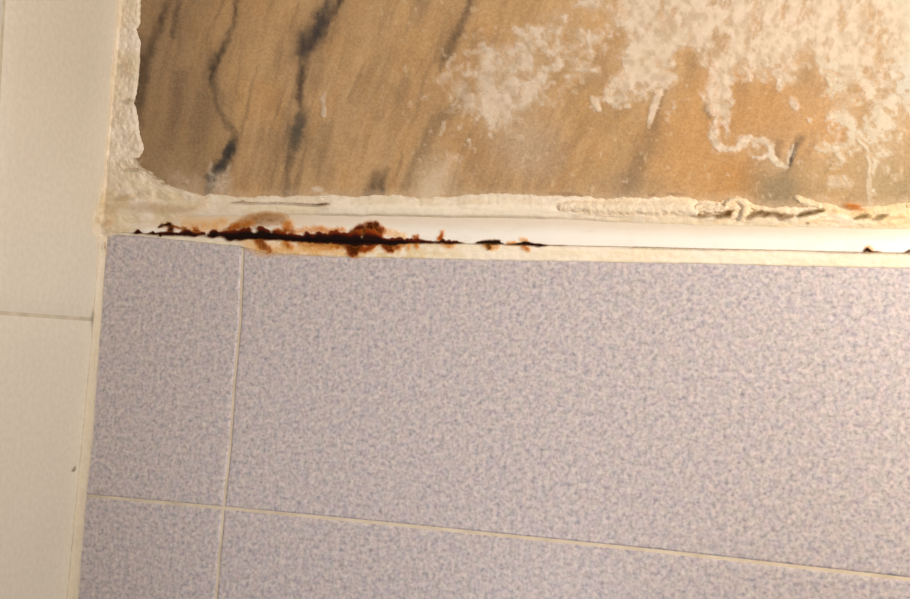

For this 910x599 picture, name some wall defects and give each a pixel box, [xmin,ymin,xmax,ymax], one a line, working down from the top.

rust [134,217,463,258]
rust [476,239,563,252]